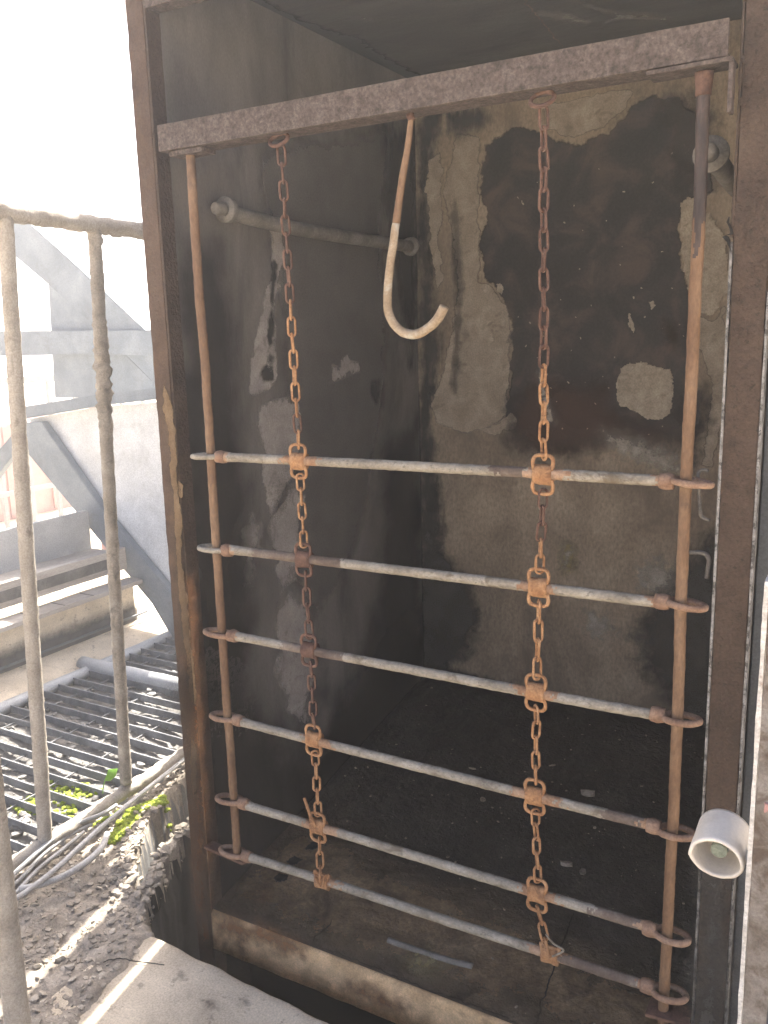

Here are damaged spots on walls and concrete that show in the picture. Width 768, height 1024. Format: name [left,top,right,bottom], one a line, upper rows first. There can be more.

peeling [249,231,301,516]
peeling [424,95,729,467]
damp [603,430,679,473]
damp [629,533,715,726]